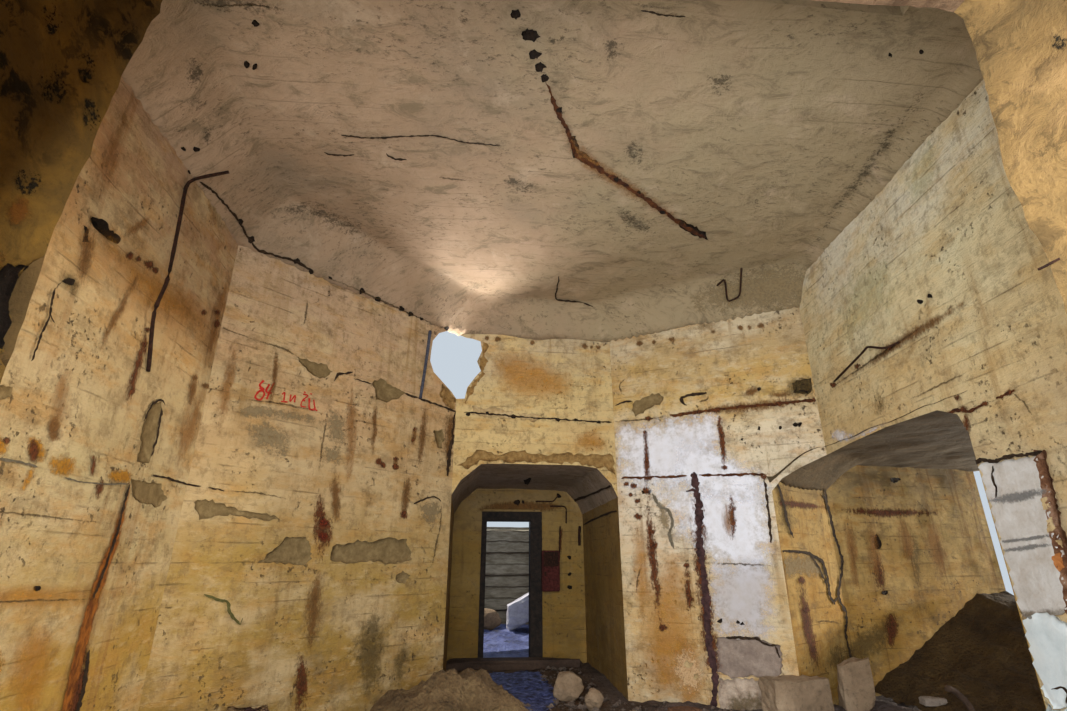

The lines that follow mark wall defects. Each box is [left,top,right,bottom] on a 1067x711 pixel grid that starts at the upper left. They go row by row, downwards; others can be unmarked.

crack [510,9,708,240]
crack [200,182,449,331]
rust [830,303,963,387]
peeling [137,399,165,463]
peeling [131,479,167,508]
peeling [194,499,282,521]
peeling [258,537,312,566]
rust [313,473,341,558]
peeling [330,537,412,583]
rust [624,431,668,631]
crack [822,491,852,658]
rust [295,579,321,711]